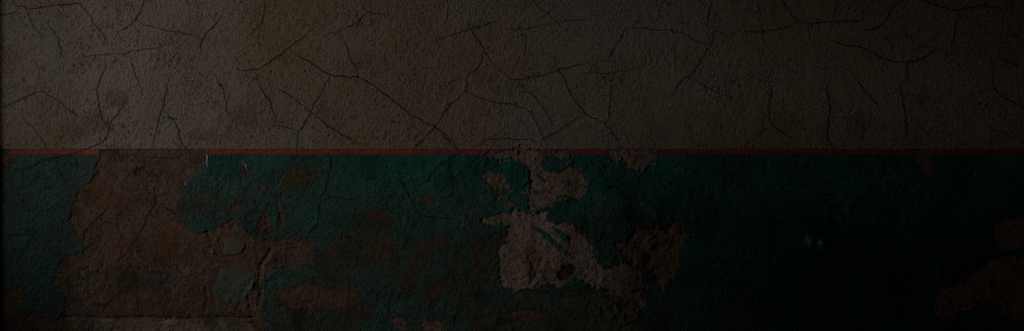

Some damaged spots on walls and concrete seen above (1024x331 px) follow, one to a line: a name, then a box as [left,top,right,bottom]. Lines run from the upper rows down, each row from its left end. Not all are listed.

crack [239,0,1024,253]
peeling [0,149,314,331]
peeling [478,144,649,313]